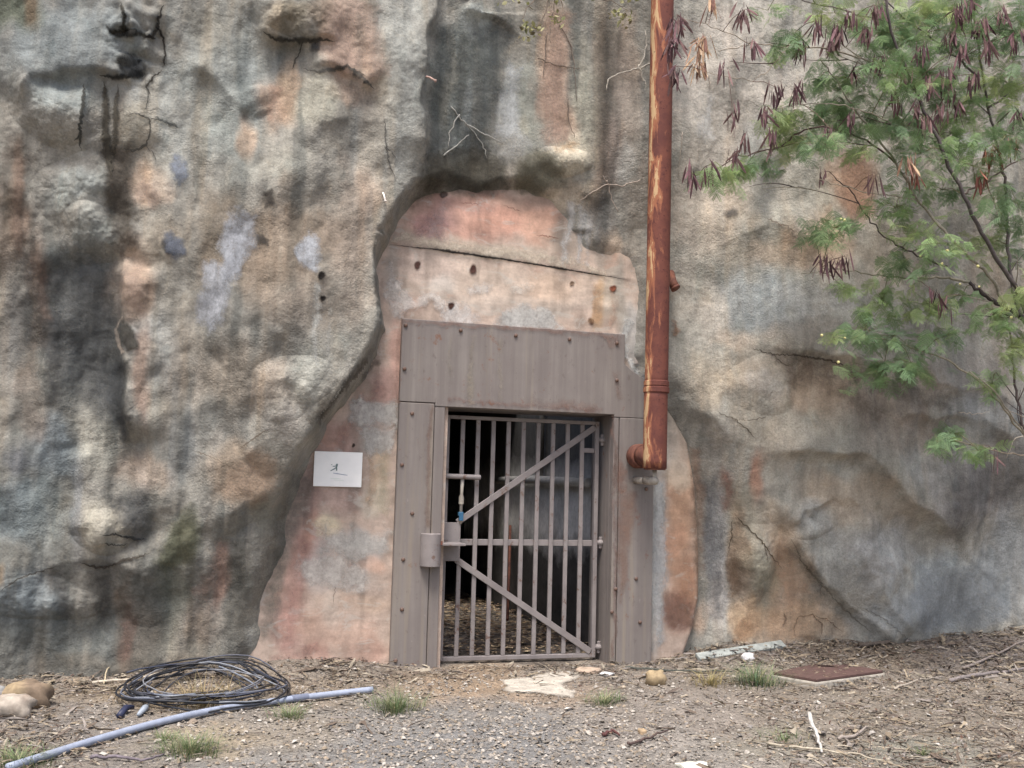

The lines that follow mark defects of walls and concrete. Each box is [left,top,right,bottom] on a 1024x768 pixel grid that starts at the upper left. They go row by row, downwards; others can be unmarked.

crack [263,31,374,89]
crack [74,3,178,178]
leakage [425,28,527,198]
crack [397,245,626,280]
crack [754,349,854,369]
crack [80,533,147,569]
crack [727,517,800,570]
crack [783,614,908,639]